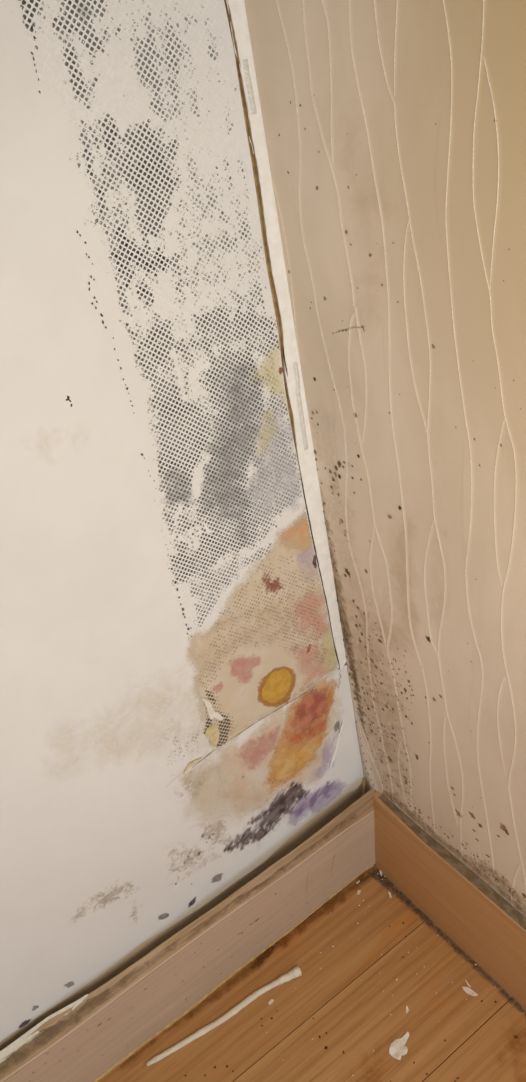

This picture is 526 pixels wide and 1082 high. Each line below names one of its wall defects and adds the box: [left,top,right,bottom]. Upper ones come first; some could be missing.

water stain [19,0,120,109]
water stain [76,12,526,913]
peeling [201,697,224,747]
water stain [34,991,106,1053]